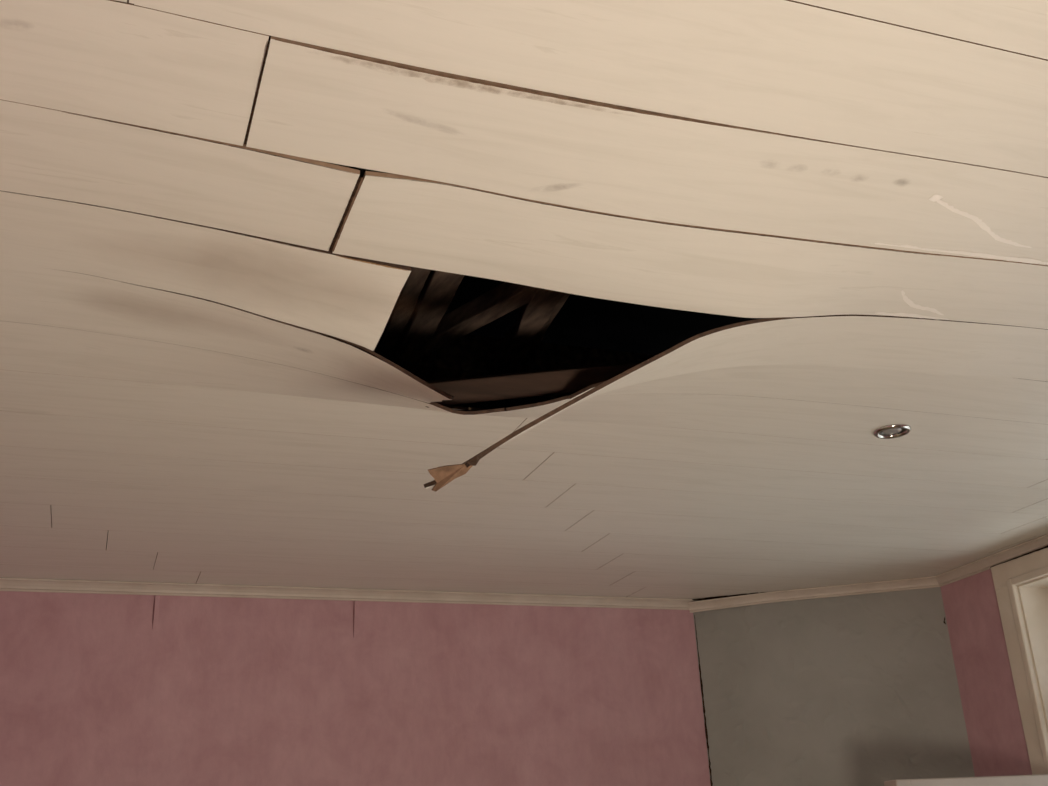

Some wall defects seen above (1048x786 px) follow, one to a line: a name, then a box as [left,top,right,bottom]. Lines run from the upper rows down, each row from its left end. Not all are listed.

peeling [428,464,472,492]